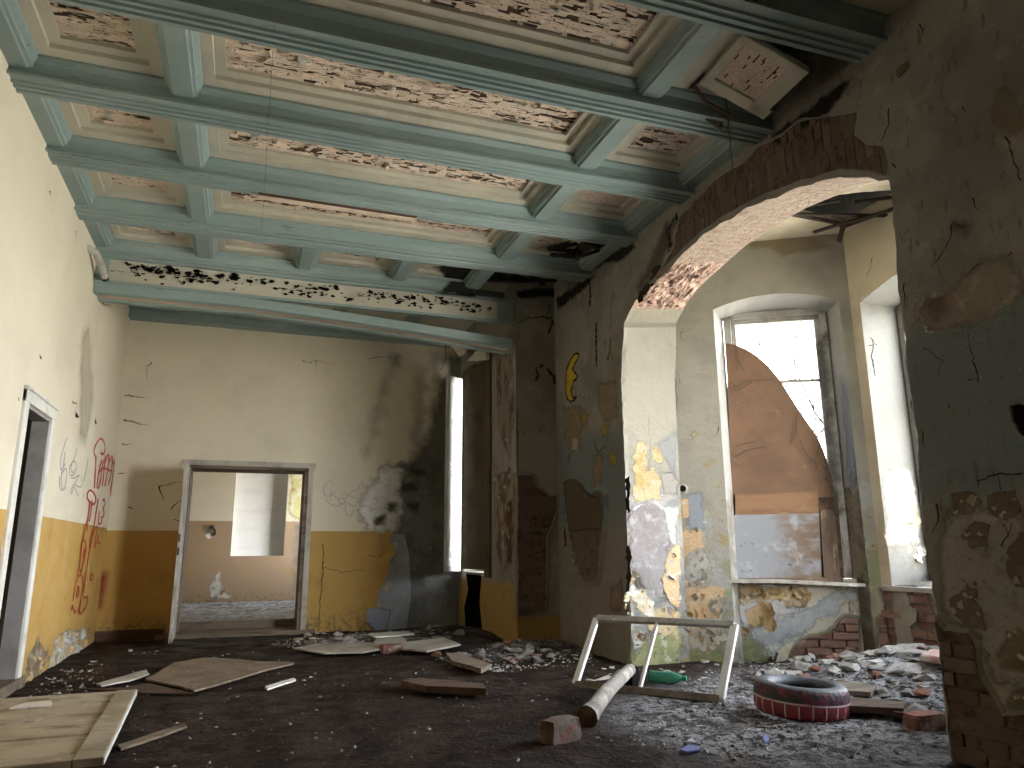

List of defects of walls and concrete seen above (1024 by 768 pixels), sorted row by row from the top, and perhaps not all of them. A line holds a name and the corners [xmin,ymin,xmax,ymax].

peeling [422,0,657,50]
peeling [226,38,582,133]
flaking render [629,105,895,309]
peeling [124,261,492,313]
peeling [26,628,92,681]
crack [318,544,383,632]
water stain [359,356,461,628]
flaking render [493,468,610,620]
flaking render [624,434,812,653]
flaking render [767,614,862,662]
peeling [883,468,926,563]
flaking render [876,491,1024,768]